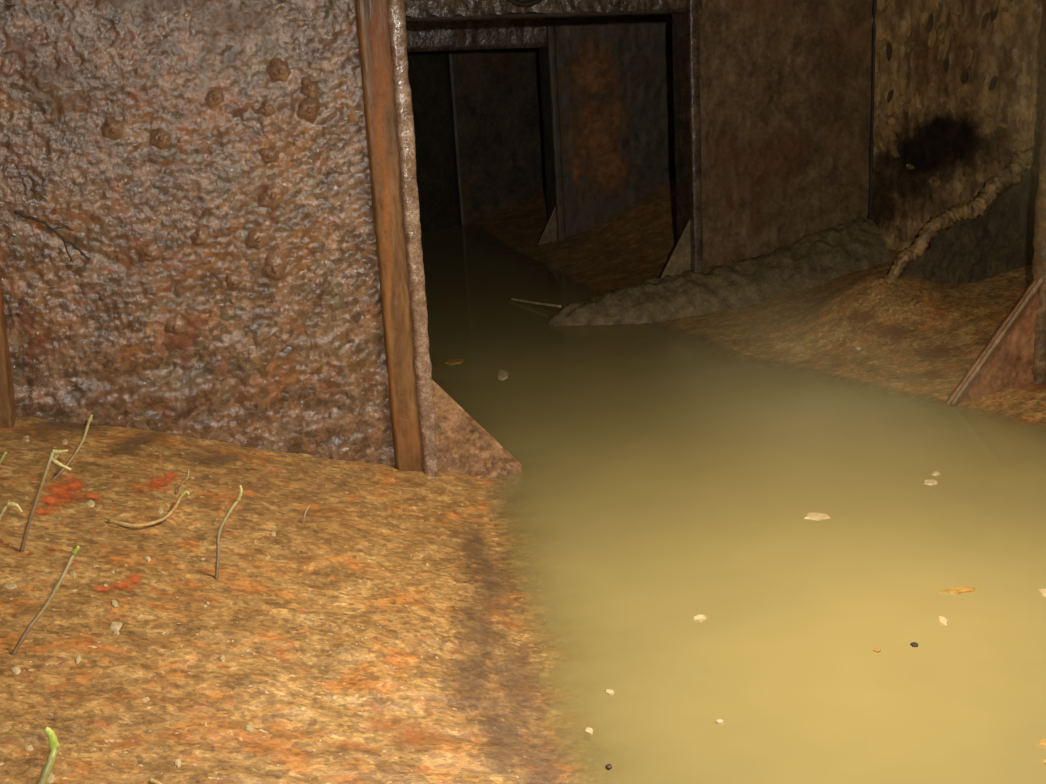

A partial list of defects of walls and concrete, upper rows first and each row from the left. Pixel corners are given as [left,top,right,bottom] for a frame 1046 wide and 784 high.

corrosion [204,89,224,108]
corrosion [257,98,275,117]
corrosion [266,58,320,123]
corrosion [100,115,125,140]
corrosion [149,127,171,150]
corrosion [258,146,280,164]
corrosion [245,182,288,281]